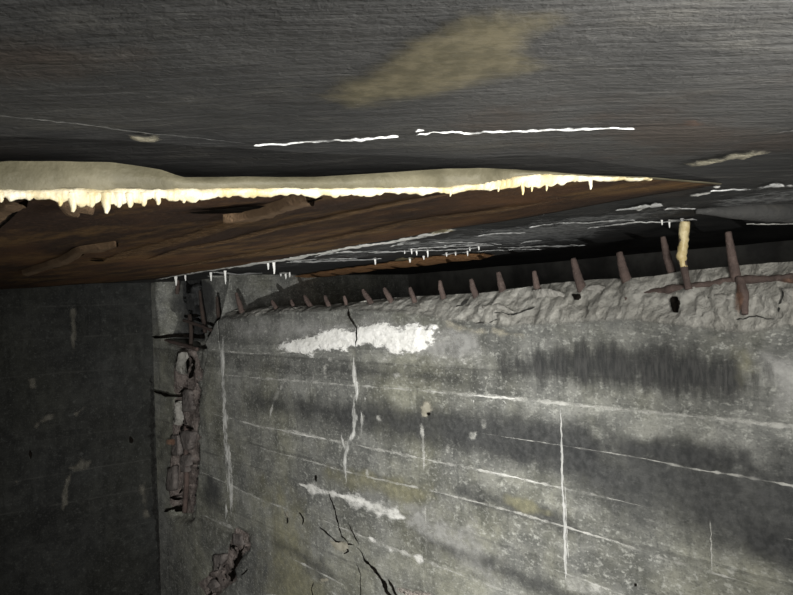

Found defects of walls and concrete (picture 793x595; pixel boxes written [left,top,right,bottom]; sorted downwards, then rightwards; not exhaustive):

crack [7,116,398,146]
water stain [0,174,652,214]
crack [0,161,744,192]
water stain [162,191,793,286]
spalling [216,221,793,333]
crack [416,127,635,135]
spalling [153,291,207,514]
water stain [211,349,236,528]
water stain [276,322,474,477]
spalling [198,528,251,595]
crack [284,495,397,595]
water stain [300,484,423,523]